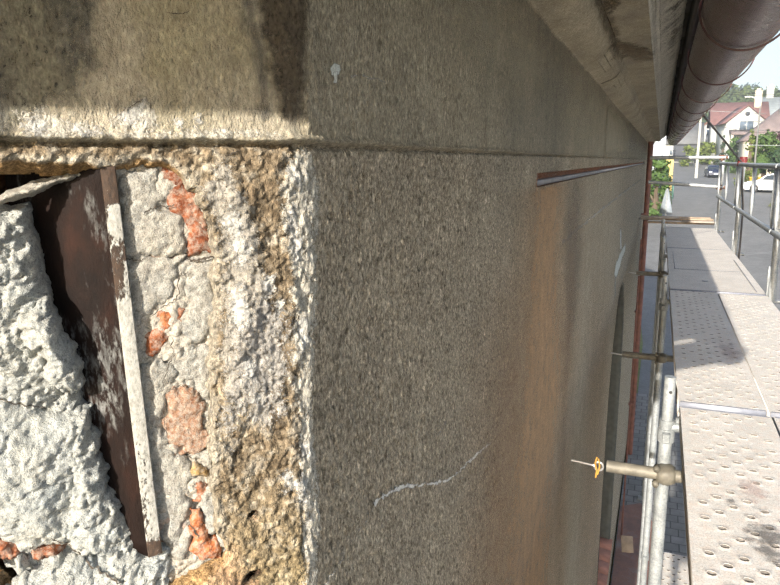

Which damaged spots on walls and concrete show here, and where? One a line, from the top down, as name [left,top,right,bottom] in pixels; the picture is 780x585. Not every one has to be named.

leakage [595,0,619,50]
leakage [0,0,308,147]
spalling [0,173,81,206]
spalling [116,164,226,582]
spalling [0,538,21,567]
spalling [31,543,67,560]